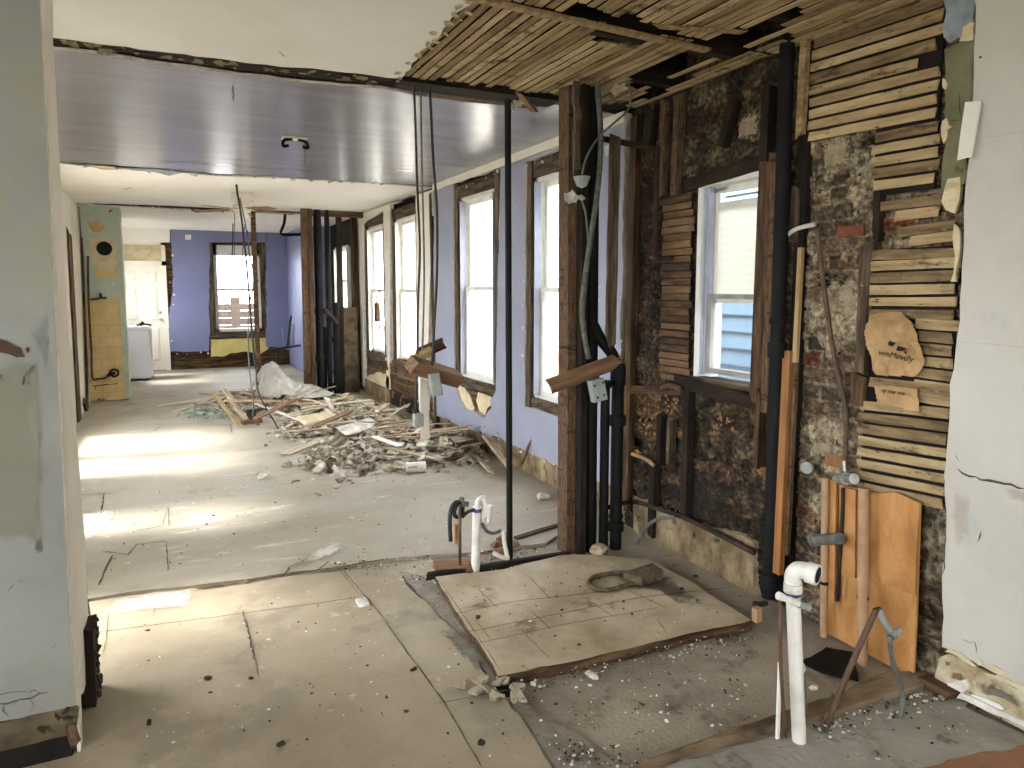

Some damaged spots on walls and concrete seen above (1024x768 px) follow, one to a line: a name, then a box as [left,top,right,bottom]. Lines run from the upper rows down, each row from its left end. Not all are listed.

spalling [53,39,139,55]
spalling [159,55,238,70]
spalling [394,0,486,84]
flaking render [610,16,780,593]
flaking render [785,0,976,565]
peeling [0,339,30,357]
crack [955,455,1024,489]
flaking render [801,579,820,625]
flaking render [915,502,1024,730]
crack [0,690,47,716]
spalling [0,665,83,752]